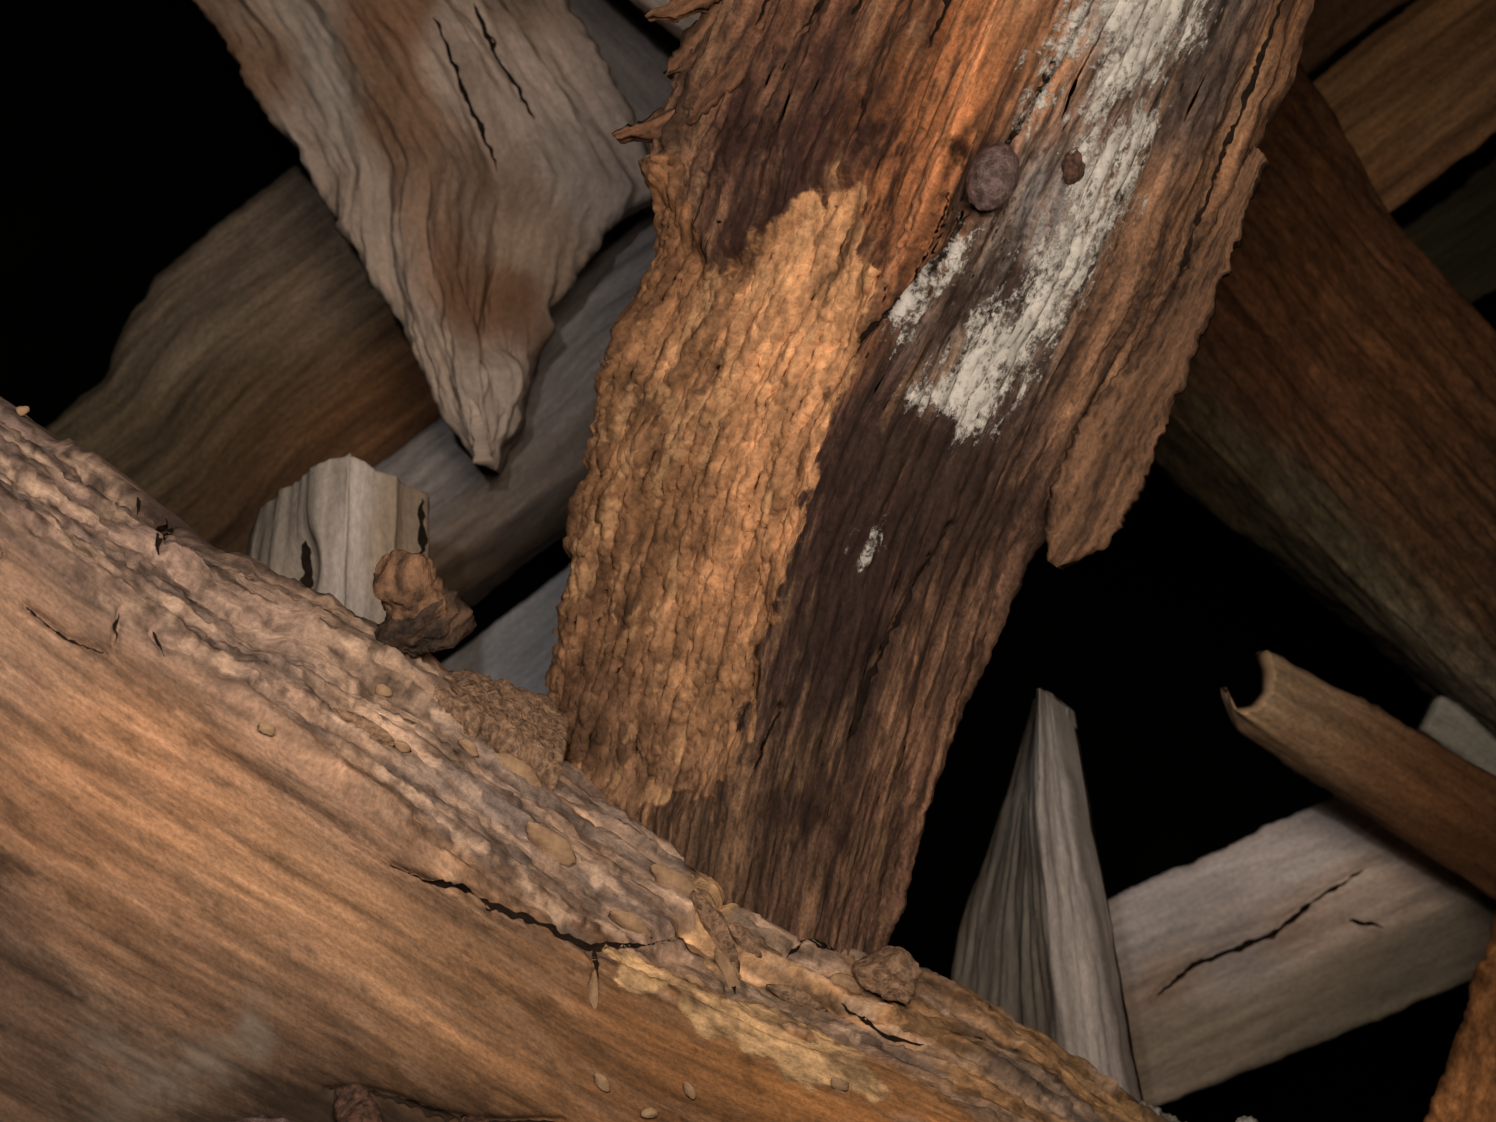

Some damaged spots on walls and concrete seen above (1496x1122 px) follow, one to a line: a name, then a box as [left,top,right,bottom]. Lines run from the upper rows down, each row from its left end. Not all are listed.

crack [432,3,535,171]
damp [768,0,1216,856]
crack [1154,864,1384,1001]